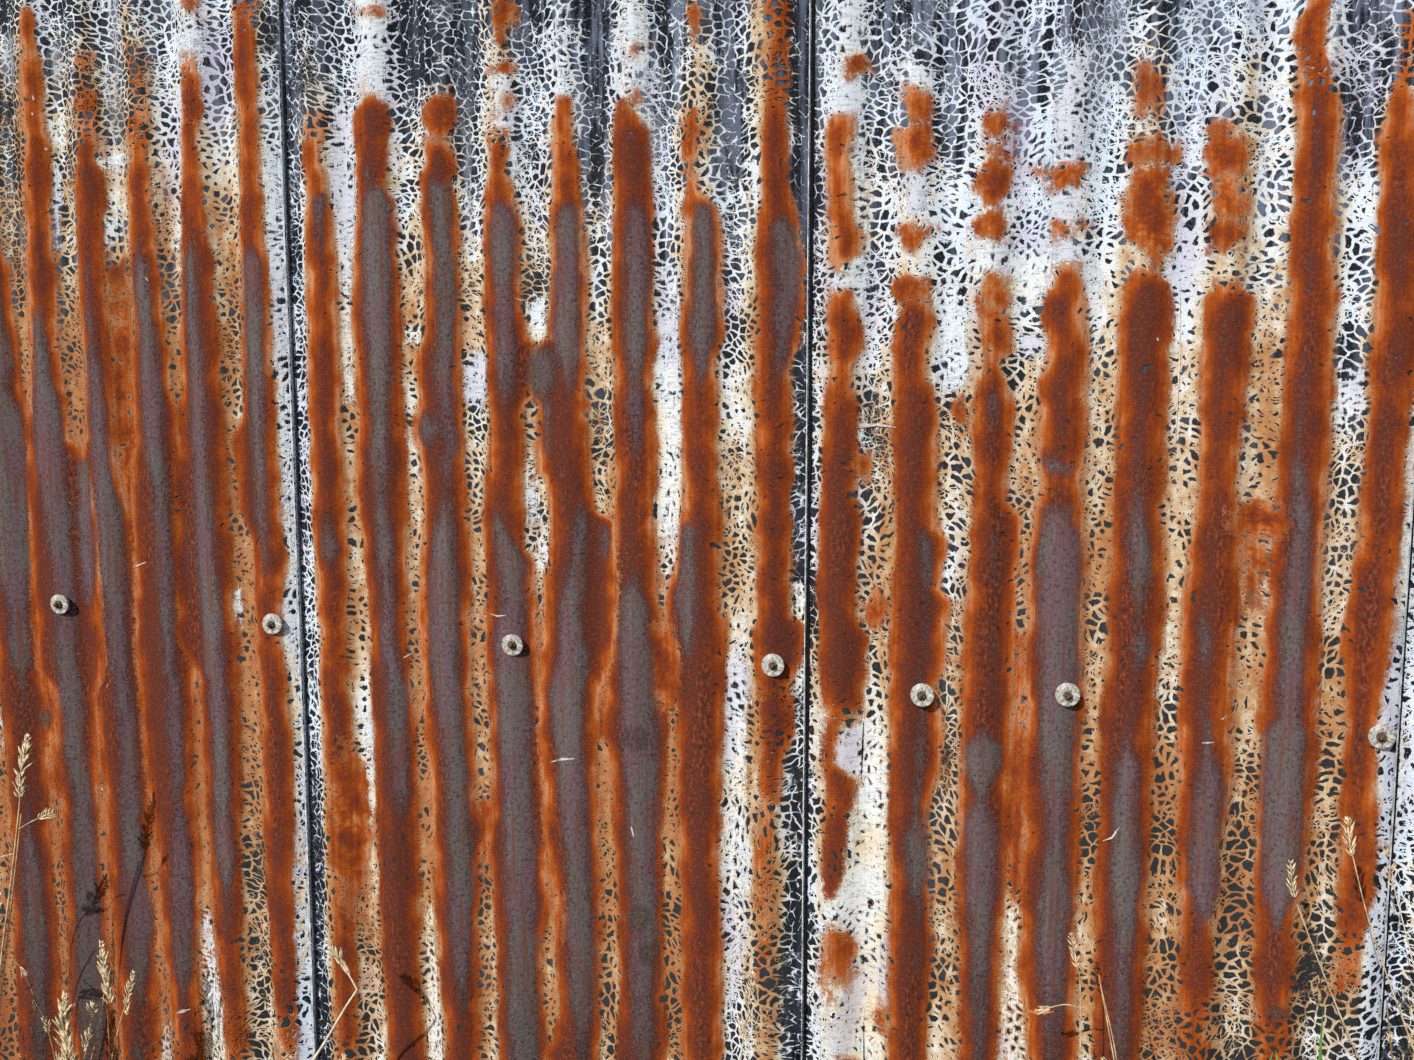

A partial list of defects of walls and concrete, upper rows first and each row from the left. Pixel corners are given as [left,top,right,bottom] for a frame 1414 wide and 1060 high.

rust [353,3,387,18]
rust [485,0,521,74]
rust [0,0,300,1060]
peeling [321,521,340,566]
crack [334,342,375,465]
rust [301,89,730,1060]
crack [510,364,580,661]
rust [751,0,1414,1060]
crack [406,856,463,1060]
crack [455,840,511,1060]
crack [538,742,629,1060]
crack [651,693,711,1060]